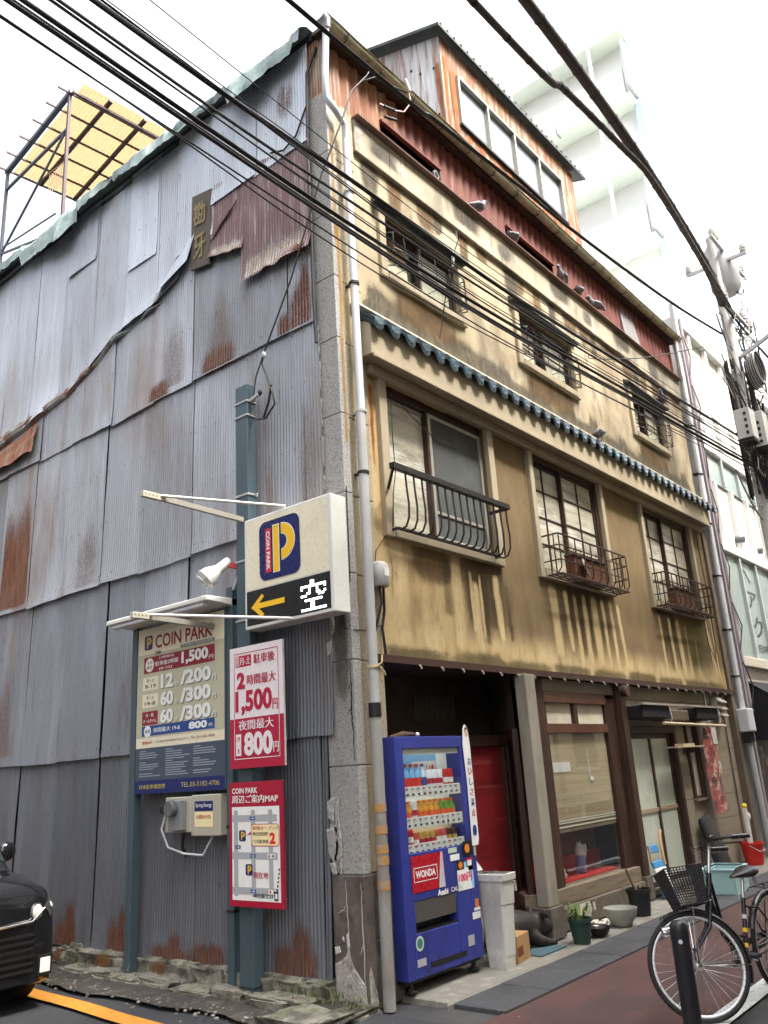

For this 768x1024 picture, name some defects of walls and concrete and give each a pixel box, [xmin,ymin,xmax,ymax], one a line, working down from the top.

corrosion [148,311,186,403]
corrosion [200,279,240,377]
corrosion [277,228,312,335]
corrosion [0,491,32,611]
leakage [382,543,726,689]
spalling [326,796,343,875]
corrosion [52,900,79,961]
corrosion [147,933,227,975]
corrosion [269,916,322,978]
crack [339,881,366,986]